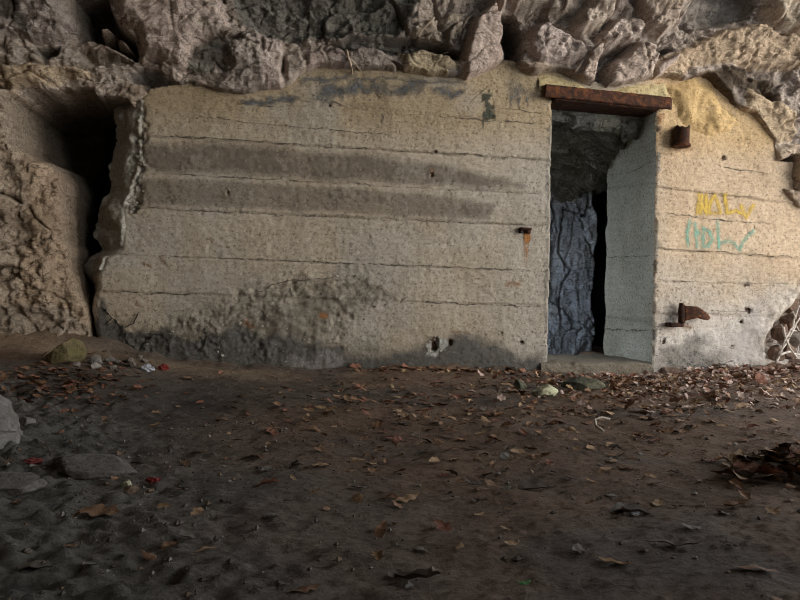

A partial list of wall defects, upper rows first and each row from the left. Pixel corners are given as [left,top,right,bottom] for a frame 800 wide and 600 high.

damp [95,300,540,371]
spalling [426,335,453,357]